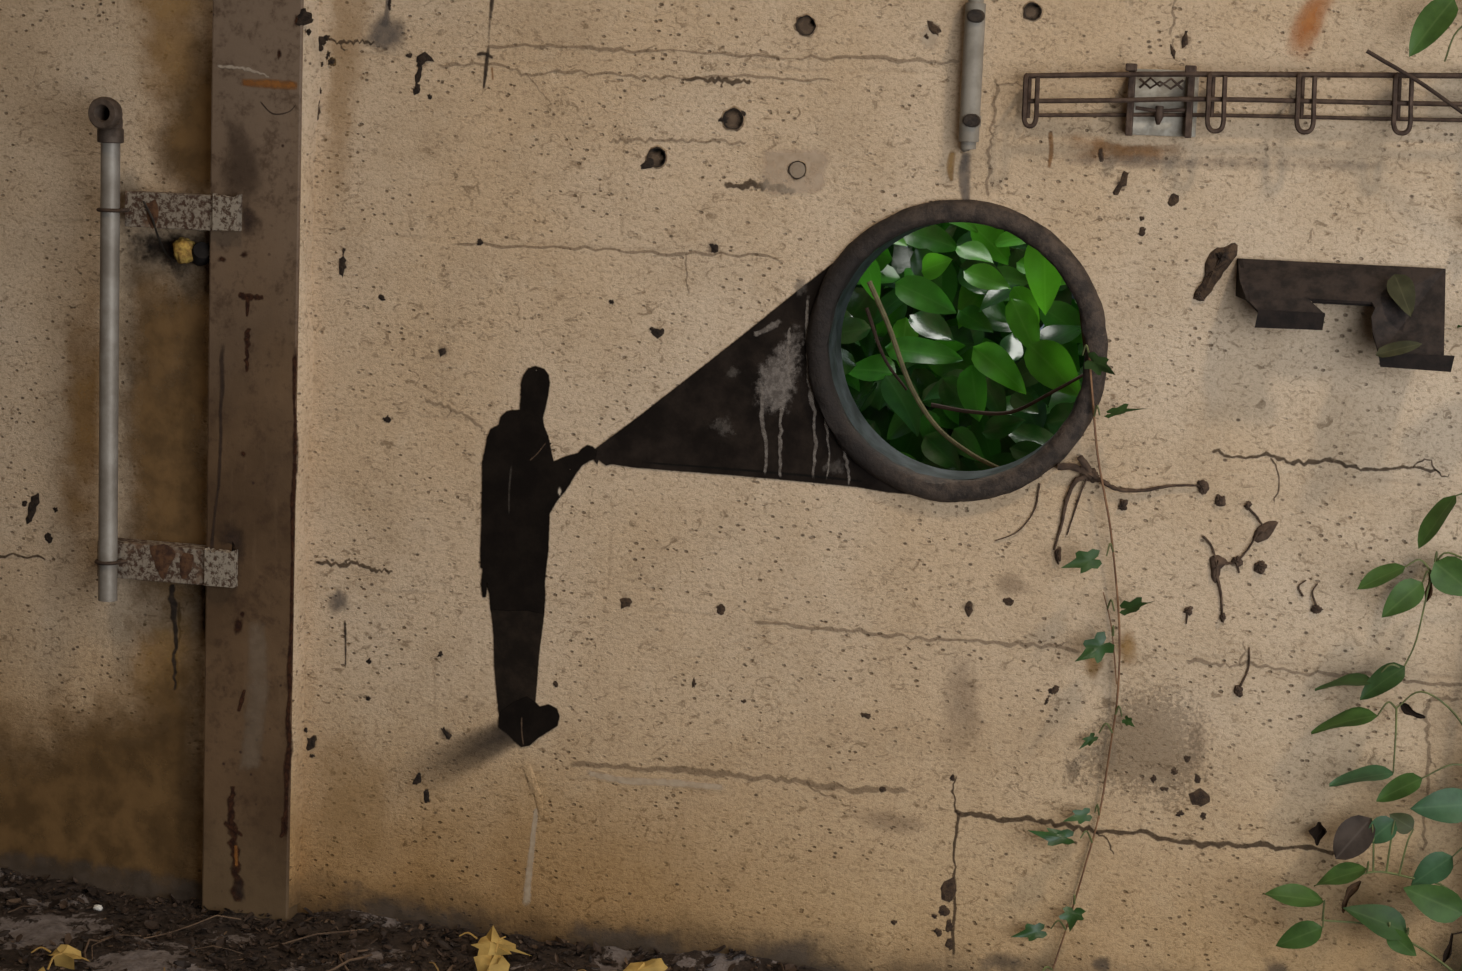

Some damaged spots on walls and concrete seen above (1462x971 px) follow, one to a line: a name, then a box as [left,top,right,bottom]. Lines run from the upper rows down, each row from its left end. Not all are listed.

leakage [144,0,212,192]
leakage [70,358,98,512]
leakage [126,236,210,545]
corrosion [149,351,241,580]
crack [1212,449,1449,501]
corrosion [280,351,299,838]
leakage [0,581,206,901]
corrosion [224,786,244,902]
crack [951,777,1334,954]